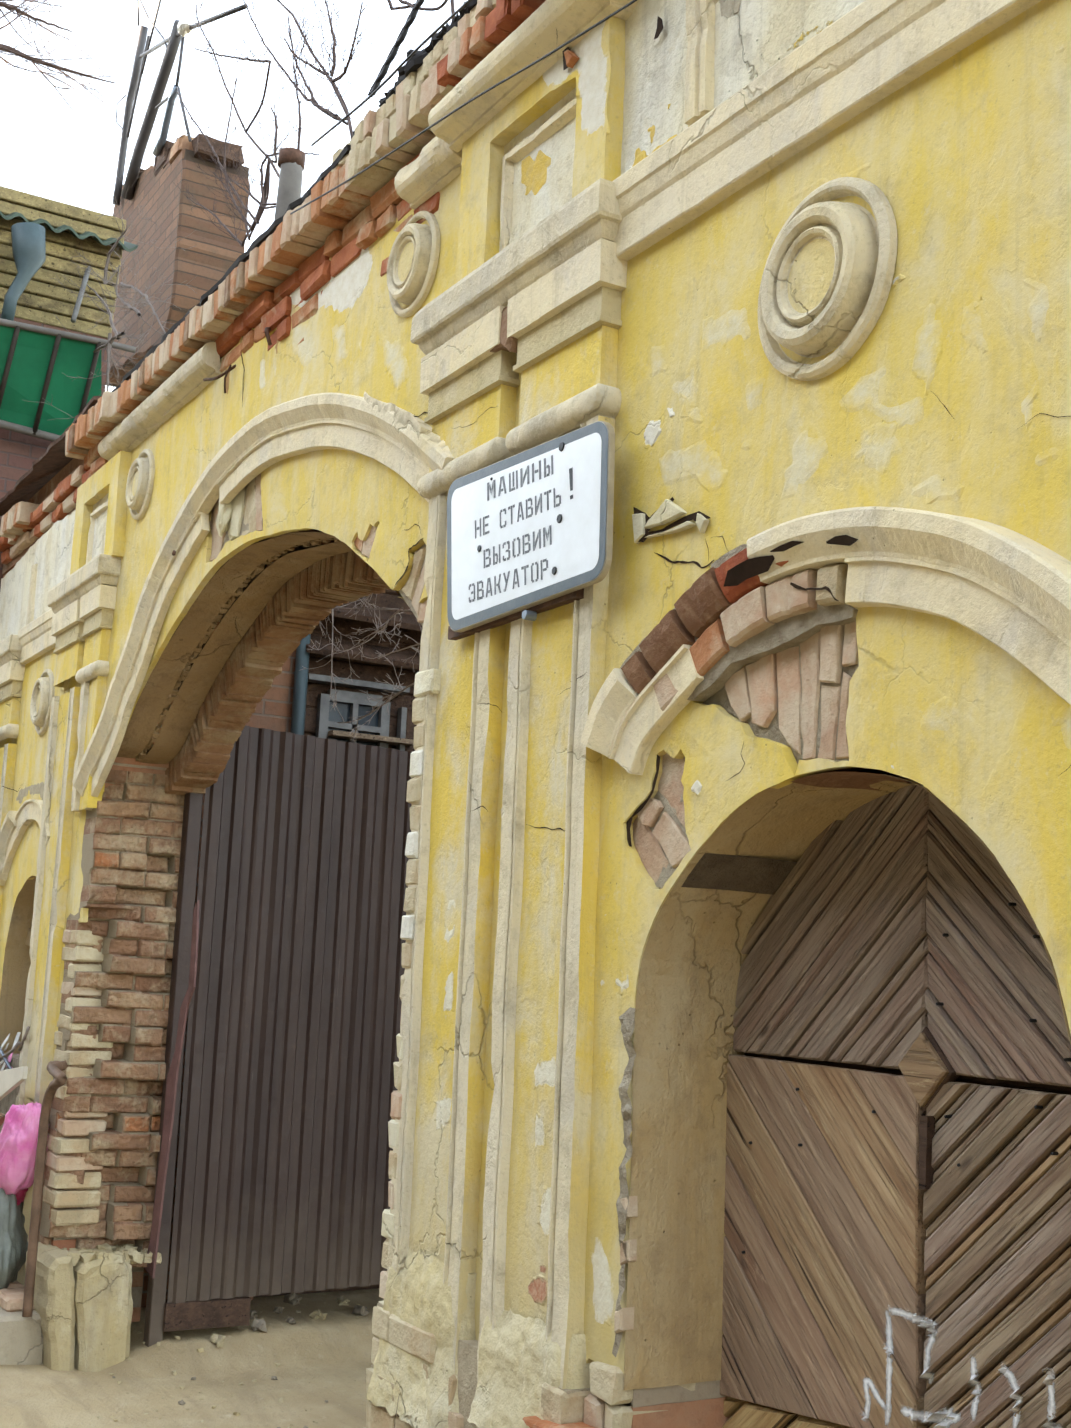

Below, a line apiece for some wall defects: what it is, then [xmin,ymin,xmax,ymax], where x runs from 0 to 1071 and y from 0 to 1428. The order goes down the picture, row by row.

flaking render [719,0,741,19]
peeling [702,308,751,352]
peeling [632,344,729,544]
spalling [702,621,859,763]
spalling [626,753,703,888]
spalling [590,974,638,1357]
spalling [527,1264,548,1306]